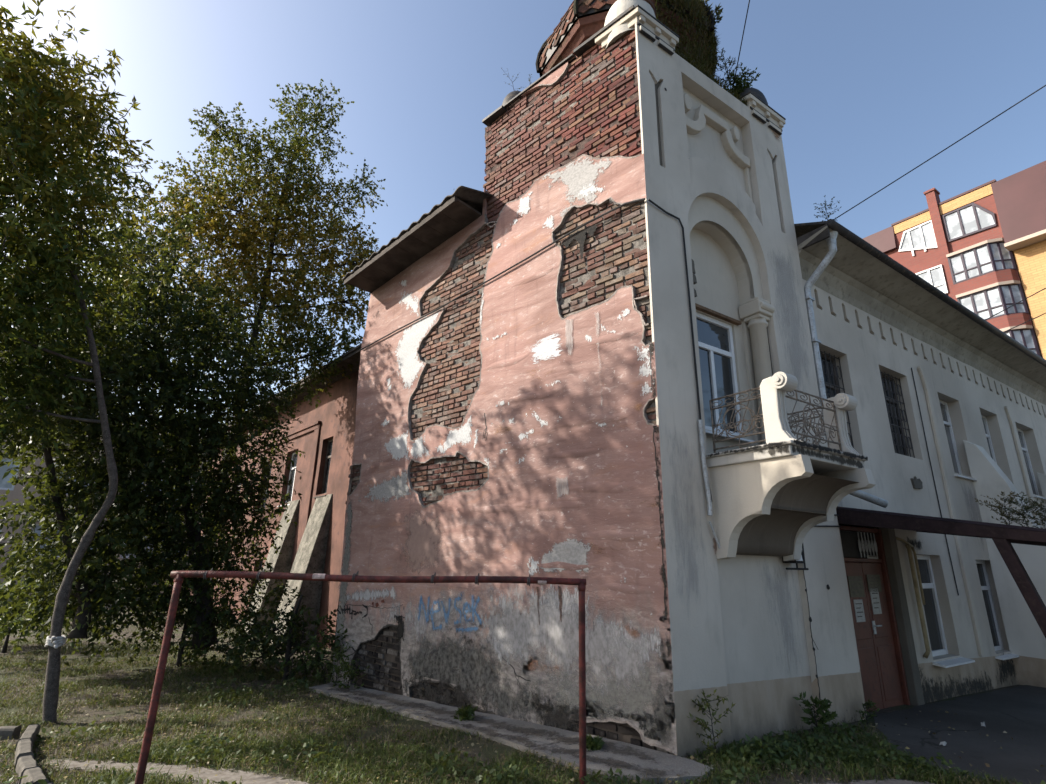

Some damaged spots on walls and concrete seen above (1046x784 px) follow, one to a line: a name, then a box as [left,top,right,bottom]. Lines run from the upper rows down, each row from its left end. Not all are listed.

spalling [384,29,642,508]
spalling [543,183,660,477]
peeling [335,463,362,652]
spalling [350,624,496,715]
damp [346,584,664,731]
peeling [527,556,547,585]
spalling [650,561,668,622]